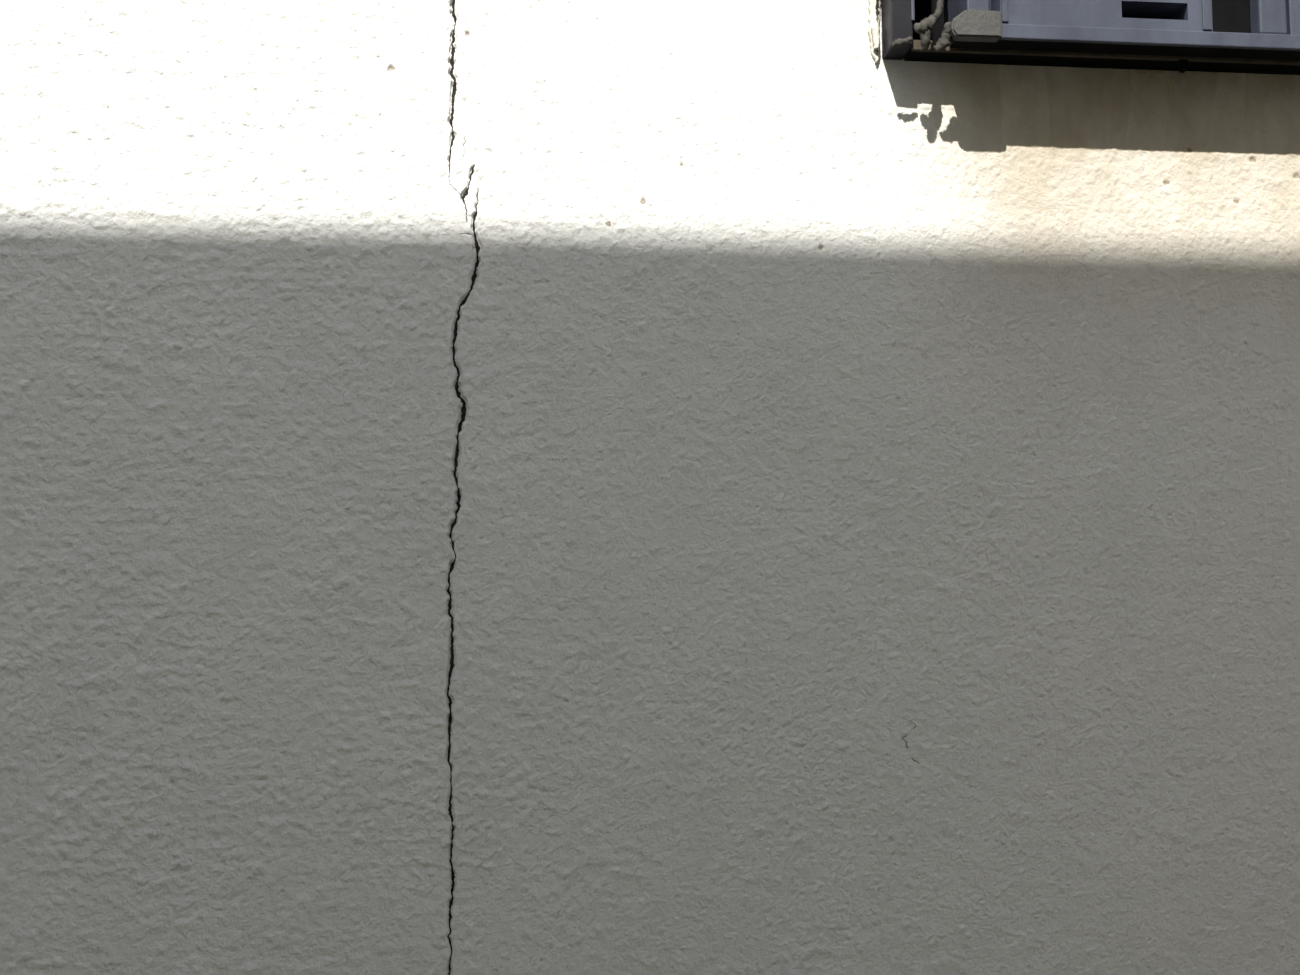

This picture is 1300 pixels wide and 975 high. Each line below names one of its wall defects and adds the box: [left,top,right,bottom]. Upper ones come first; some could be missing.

crack [447,0,480,975]